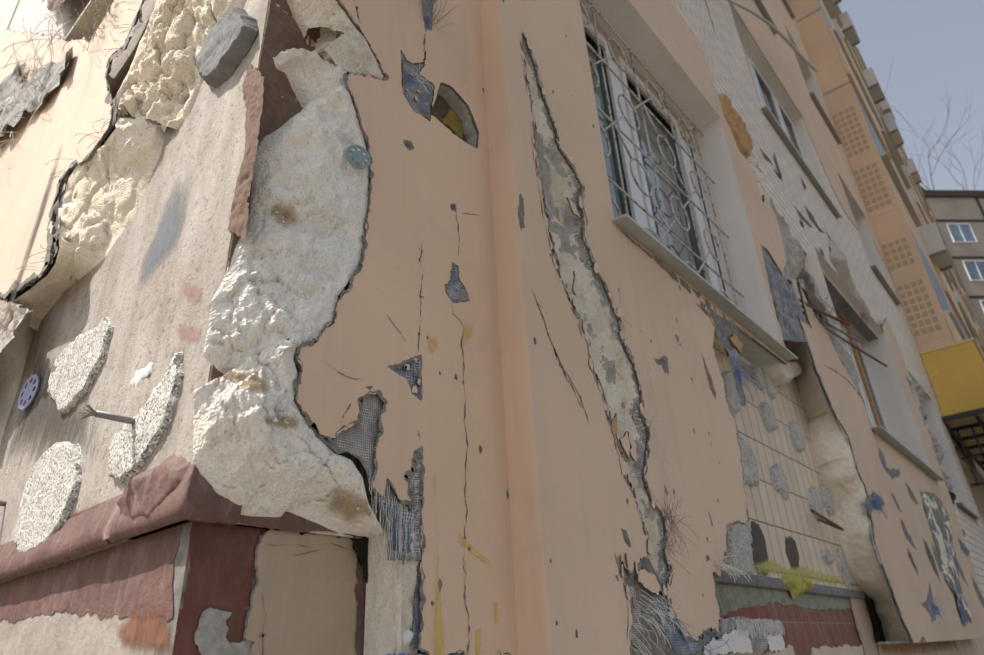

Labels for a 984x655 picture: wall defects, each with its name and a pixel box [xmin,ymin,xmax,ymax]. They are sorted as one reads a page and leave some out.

spalling [0,0,142,299]
spalling [211,364,224,381]
peeling [195,608,252,655]
spalling [227,0,323,271]
flaking render [293,0,442,655]
flaking render [445,263,469,303]
crack [455,315,470,653]
crack [532,290,589,423]
flaking render [519,31,852,655]
flaking render [761,197,984,642]